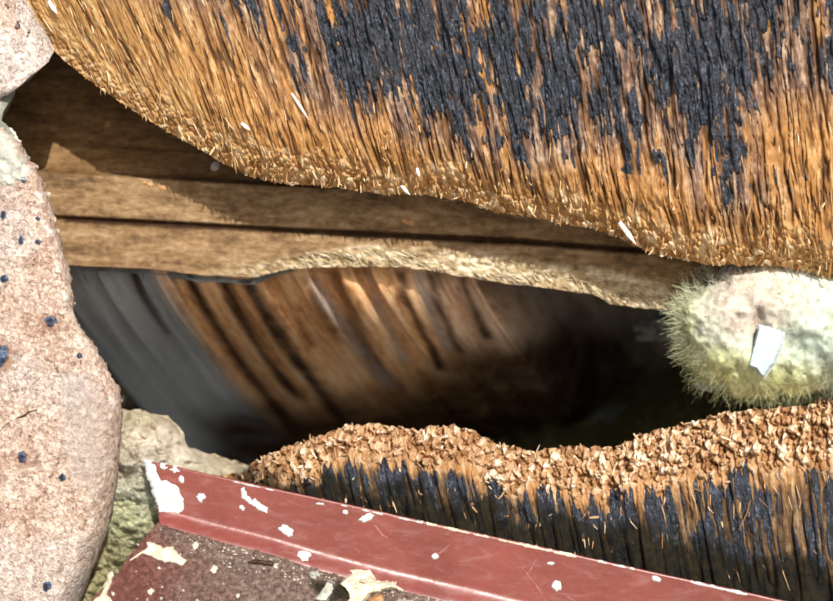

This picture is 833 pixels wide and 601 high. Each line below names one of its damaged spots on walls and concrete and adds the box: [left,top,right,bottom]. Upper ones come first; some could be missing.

peeling [143,459,184,514]
peeling [233,481,274,513]
peeling [130,542,187,566]
peeling [297,551,311,561]
peeling [94,571,114,601]
peeling [309,569,413,601]